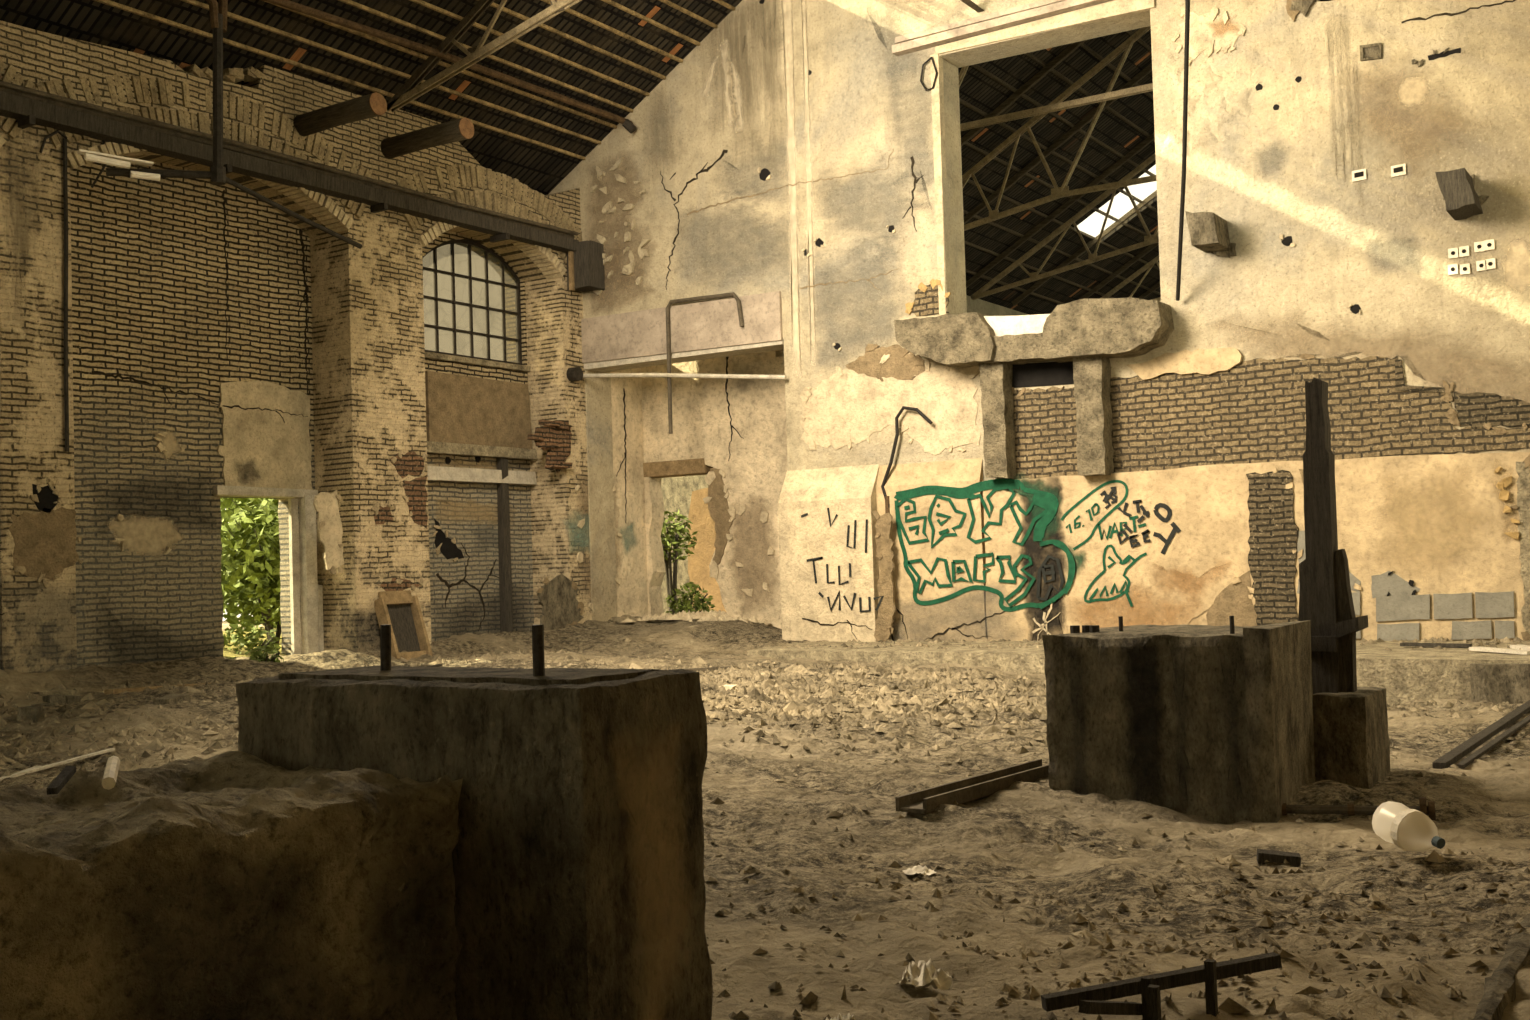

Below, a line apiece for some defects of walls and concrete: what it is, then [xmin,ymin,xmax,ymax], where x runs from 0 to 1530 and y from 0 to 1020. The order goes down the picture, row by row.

spalling [1285,0,1317,21]
peeling [590,157,651,295]
crack [660,149,924,290]
spalling [703,468,775,601]
flaking render [1011,386,1078,479]
flaking render [1110,354,1530,640]